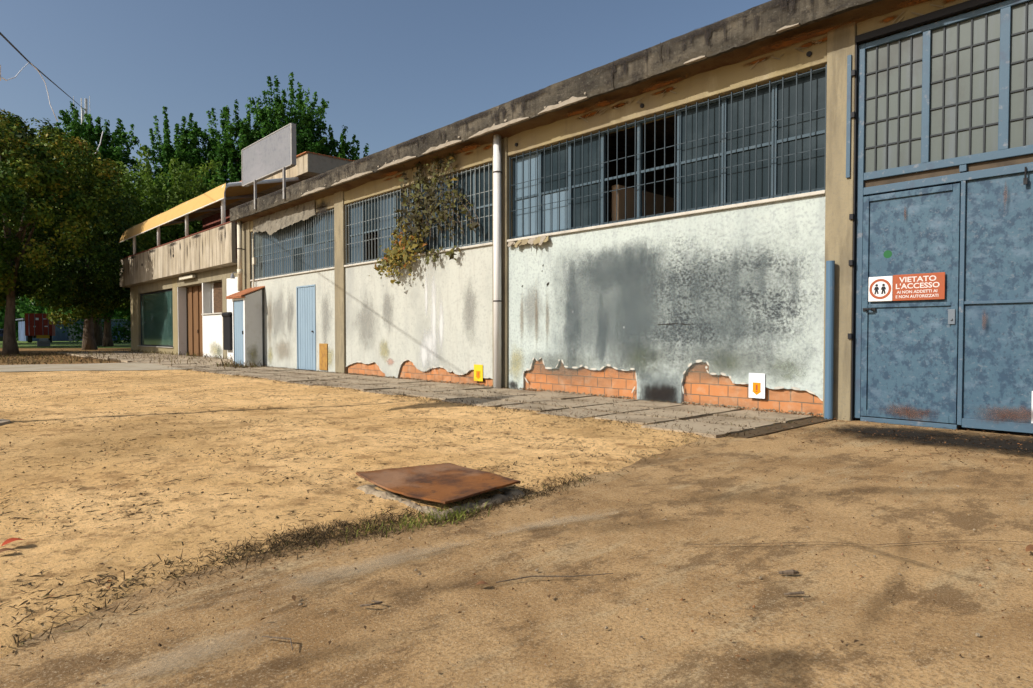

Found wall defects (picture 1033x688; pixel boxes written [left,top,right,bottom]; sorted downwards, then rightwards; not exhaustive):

peeling [346,361,385,377]
peeling [399,359,493,386]
peeling [523,357,637,399]
peeling [681,360,823,417]